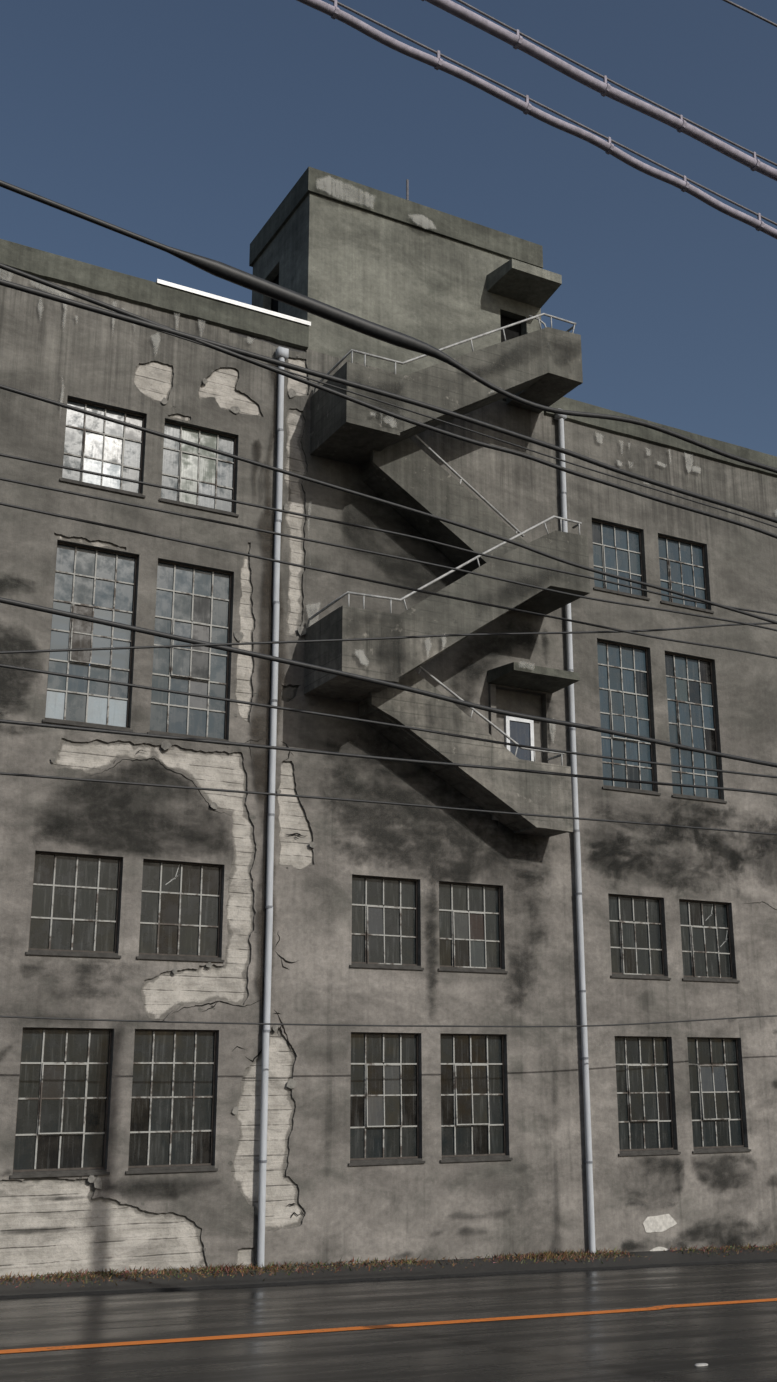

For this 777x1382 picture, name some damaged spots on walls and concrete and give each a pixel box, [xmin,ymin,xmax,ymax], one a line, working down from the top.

flaking render [133,362,191,423]
flaking render [198,365,262,419]
flaking render [284,354,310,637]
damp [0,629,36,715]
damp [47,765,224,855]
flaking render [51,738,257,1021]
flaking render [275,761,316,870]
damp [592,802,768,887]
crack [275,935,297,969]
crack [173,1000,297,1062]
flaking render [228,1025,305,1231]
flaking render [0,1175,207,1278]